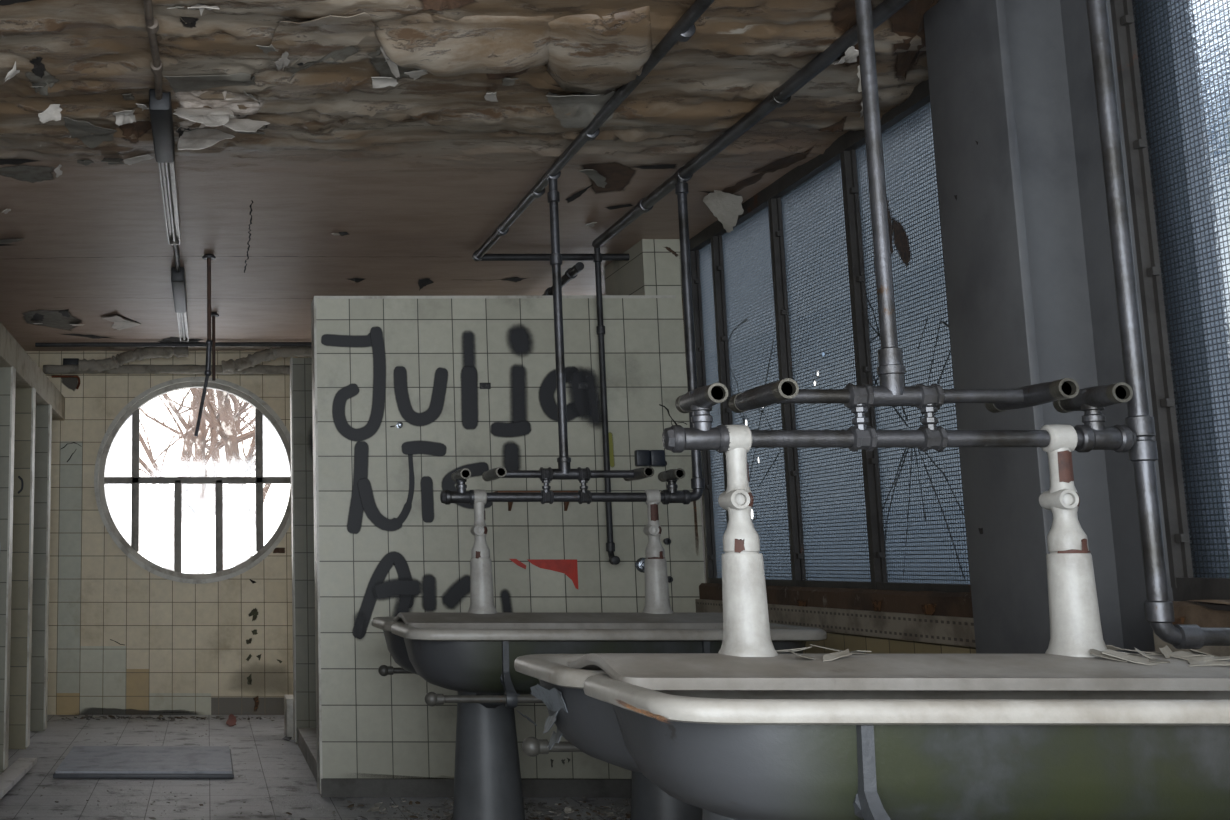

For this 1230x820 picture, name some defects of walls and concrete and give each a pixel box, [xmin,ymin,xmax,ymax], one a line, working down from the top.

peeling [5,57,154,166]
peeling [167,4,219,28]
flaking render [164,73,270,150]
peeling [257,12,428,88]
peeling [484,69,528,102]
peeling [832,43,863,117]
peeling [0,159,63,183]